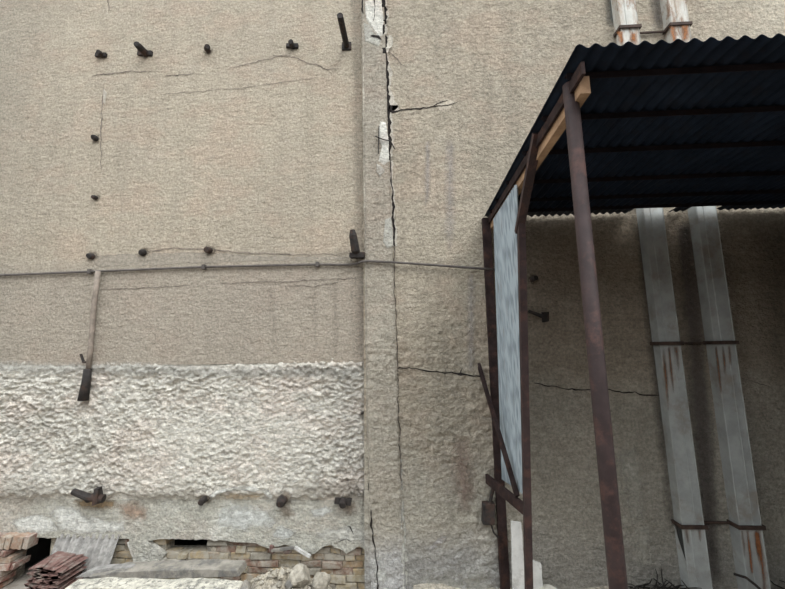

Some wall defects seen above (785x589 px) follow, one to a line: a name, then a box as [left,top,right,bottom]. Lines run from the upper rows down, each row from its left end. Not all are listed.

spalling [361,0,384,47]
spalling [375,121,395,176]
crack [381,0,480,481]
crack [535,383,657,396]
corrosion [664,347,678,397]
spalling [13,538,57,580]
spalling [110,539,137,564]
spalling [152,539,365,589]
corrosion [742,531,765,589]